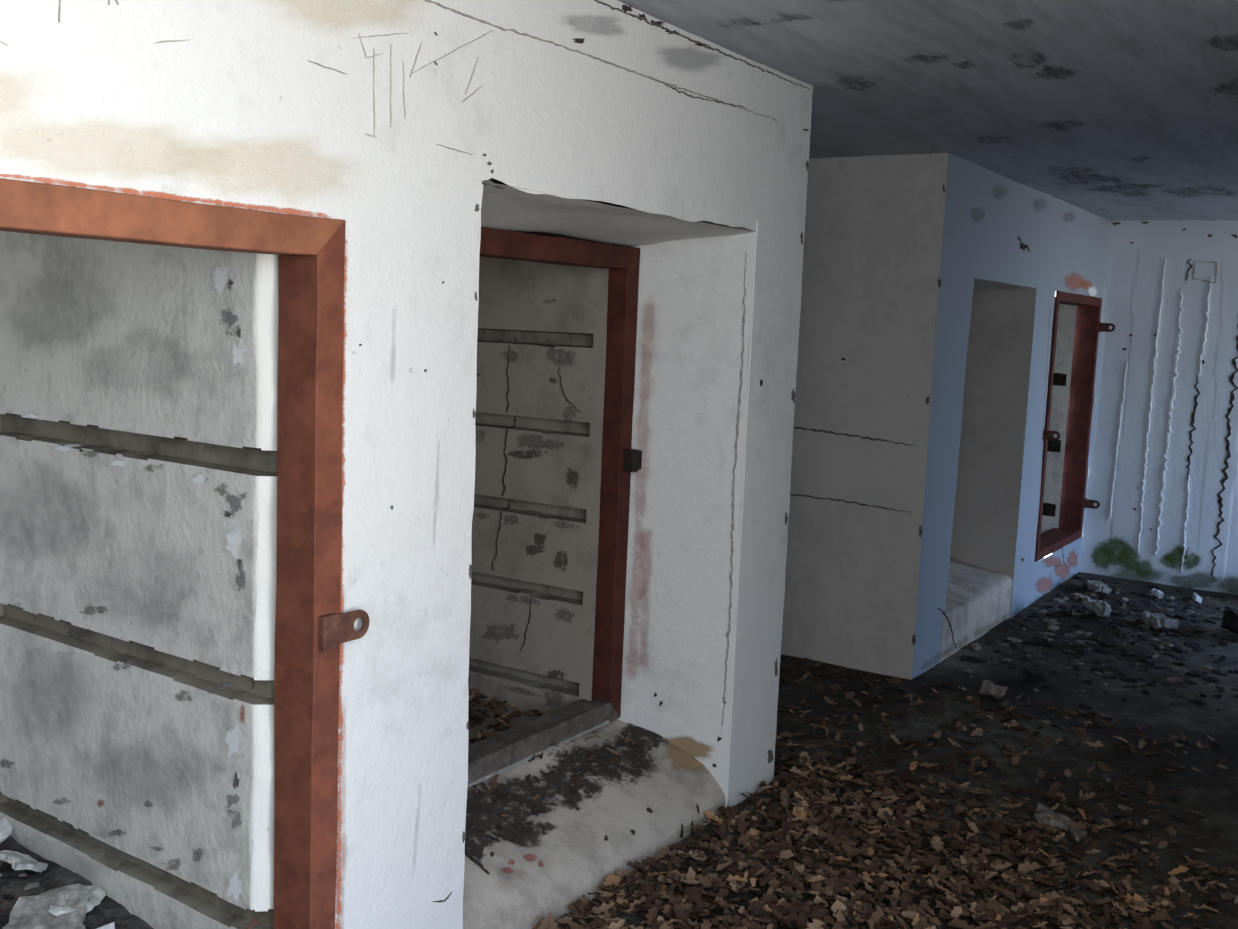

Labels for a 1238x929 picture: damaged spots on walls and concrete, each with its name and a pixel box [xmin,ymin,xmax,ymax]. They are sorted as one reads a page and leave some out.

crack [424,0,778,121]
crack [1186,316,1238,579]